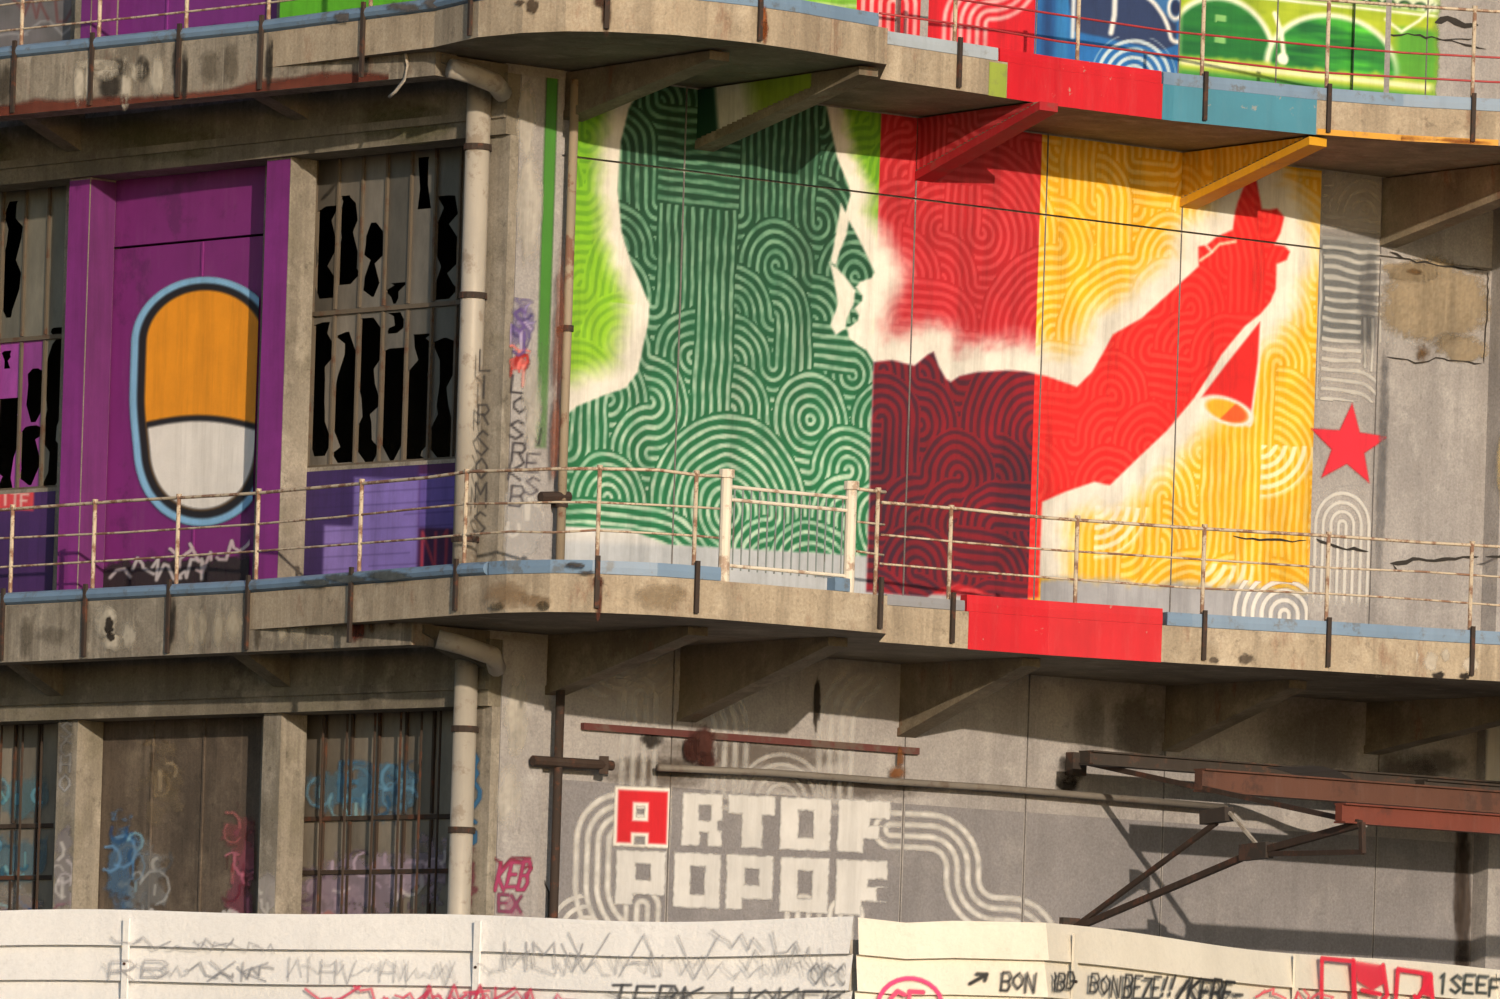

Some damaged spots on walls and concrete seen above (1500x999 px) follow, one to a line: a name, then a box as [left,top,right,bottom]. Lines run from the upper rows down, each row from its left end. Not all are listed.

rust [0,72,389,116]
crack [1234,536,1500,569]
rust [684,725,718,767]
rust [889,747,905,778]
water stain [1454,832,1471,966]